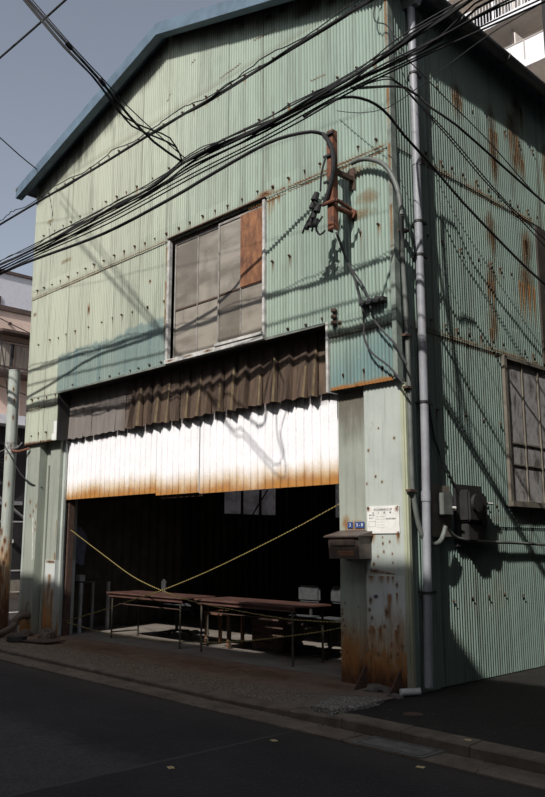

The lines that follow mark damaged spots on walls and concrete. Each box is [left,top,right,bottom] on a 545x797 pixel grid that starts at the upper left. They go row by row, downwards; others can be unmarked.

rust [488,112,524,171]
rust [487,263,500,297]
rust [66,469,339,500]
rust [0,529,11,630]
rust [369,563,398,615]
rust [341,598,408,689]